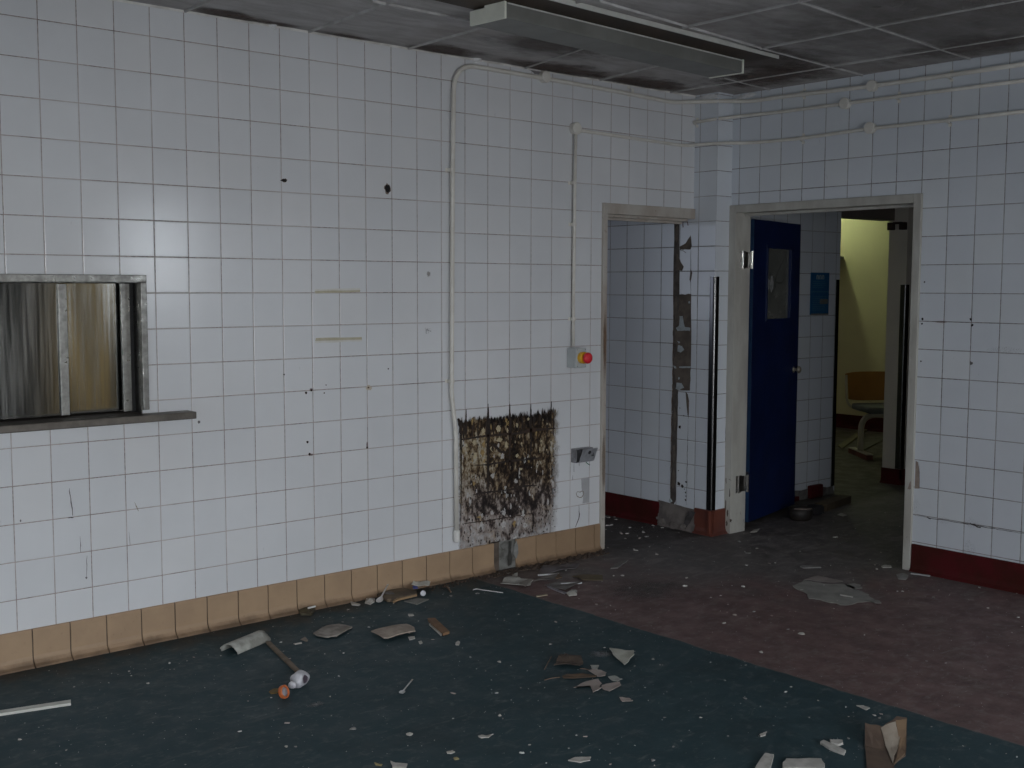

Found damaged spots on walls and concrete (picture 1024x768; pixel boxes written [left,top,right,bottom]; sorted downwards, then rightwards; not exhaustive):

spalling [674,236,692,417]
leakage [457,401,558,566]
peeling [657,498,696,533]